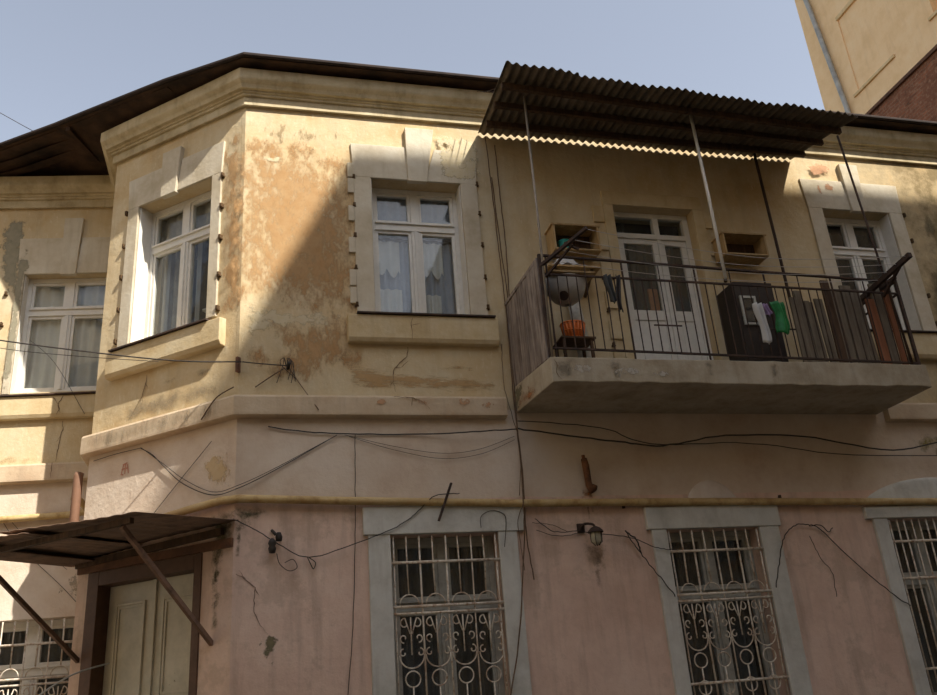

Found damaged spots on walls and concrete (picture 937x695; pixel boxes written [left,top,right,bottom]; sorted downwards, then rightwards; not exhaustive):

flaking render [0,221,29,389]
peeling [224,135,491,387]
crack [390,318,430,409]
crack [50,396,63,477]
flaking render [259,636,278,658]